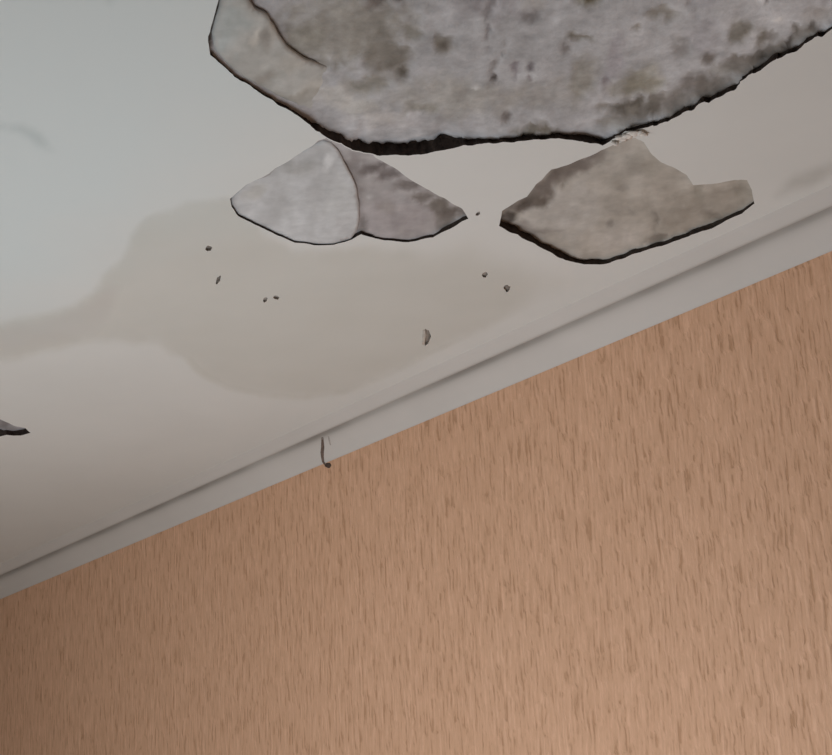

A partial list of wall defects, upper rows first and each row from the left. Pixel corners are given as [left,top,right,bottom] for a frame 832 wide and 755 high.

spalling [208,0,832,265]
flaking render [0,420,30,436]